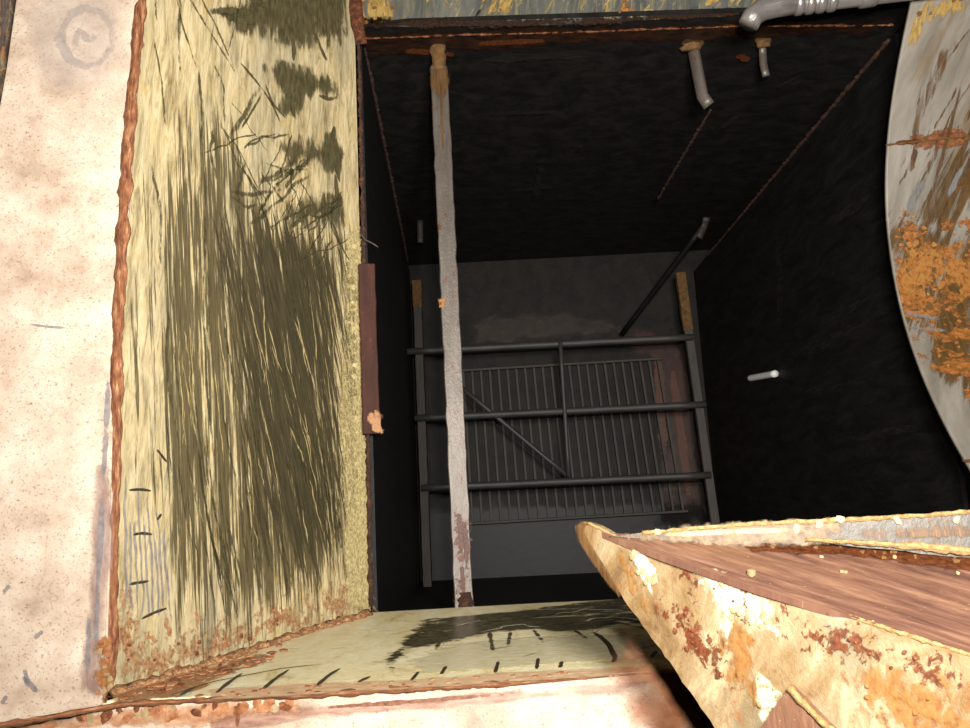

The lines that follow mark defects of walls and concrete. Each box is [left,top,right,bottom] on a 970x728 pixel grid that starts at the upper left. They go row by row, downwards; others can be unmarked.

leakage [178,0,256,58]
corrosion [475,314,970,570]
corrosion [0,389,552,728]
leakage [389,606,667,673]
corrosion [578,653,714,728]
corrosion [575,522,760,707]
corrosion [776,603,970,728]